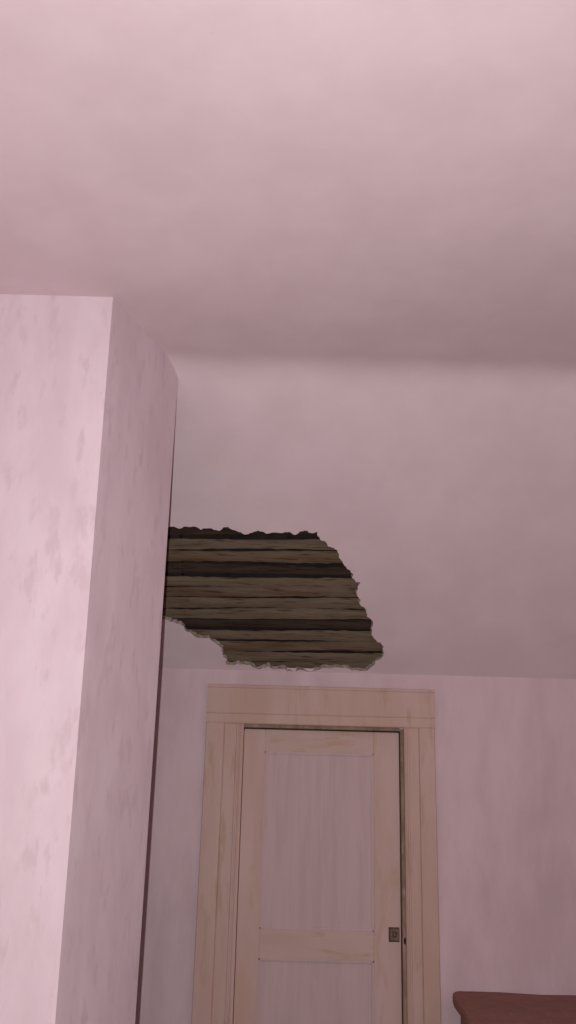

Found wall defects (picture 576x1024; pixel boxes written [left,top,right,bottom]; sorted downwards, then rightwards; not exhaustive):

flaking render [162,526,384,672]